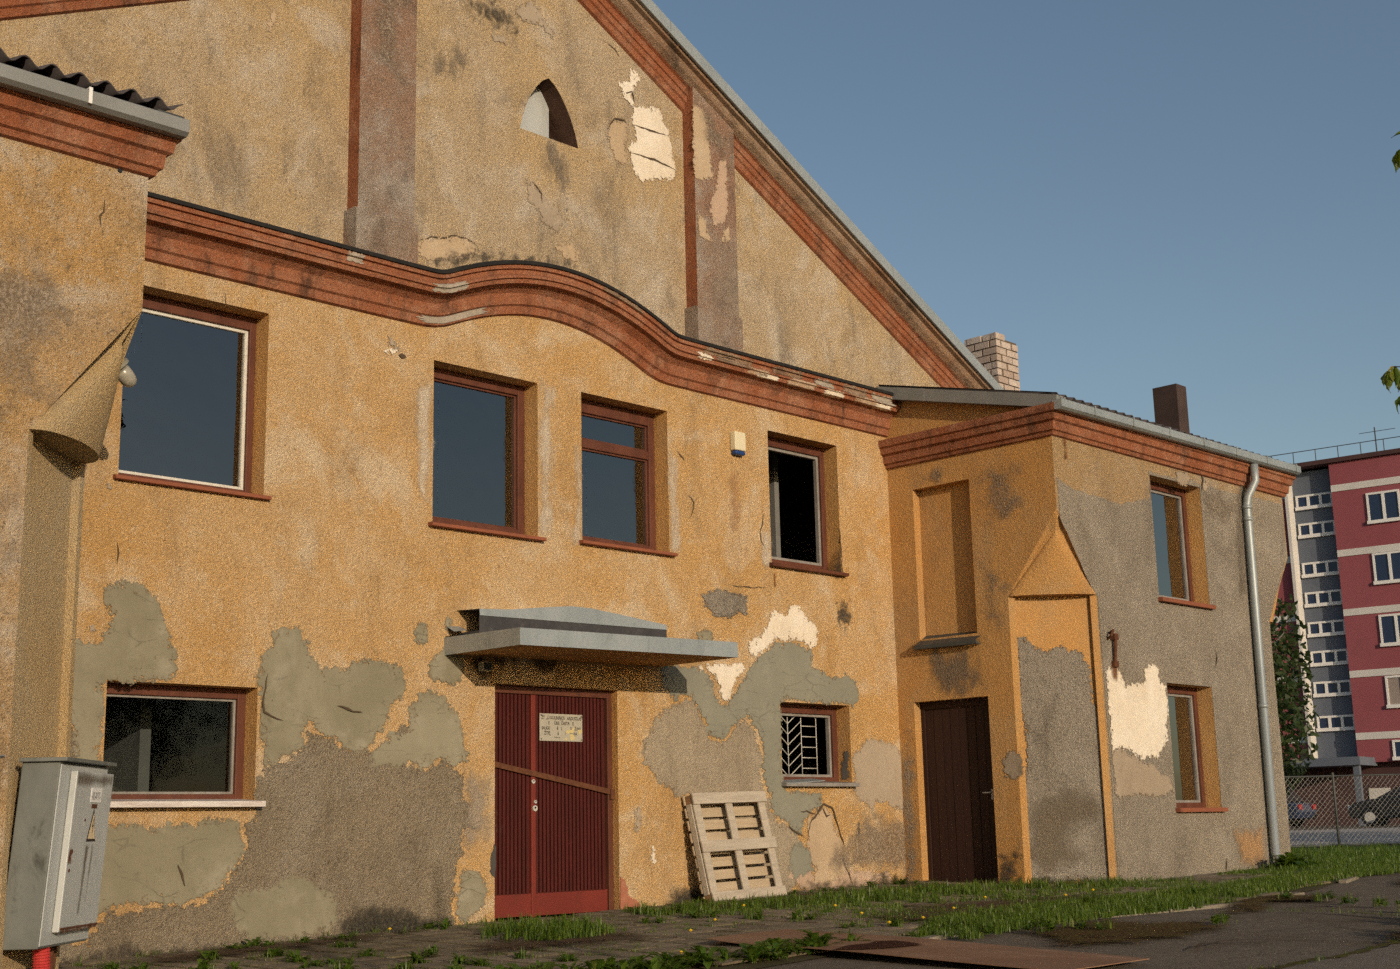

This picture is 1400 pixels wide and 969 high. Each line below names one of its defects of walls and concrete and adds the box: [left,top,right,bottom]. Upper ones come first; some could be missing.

peeling [607,68,676,182]
peeling [692,105,730,244]
peeling [698,605,819,701]
flaking render [1002,470,1291,883]
flaking render [59,731,474,963]
flaking render [642,698,916,893]